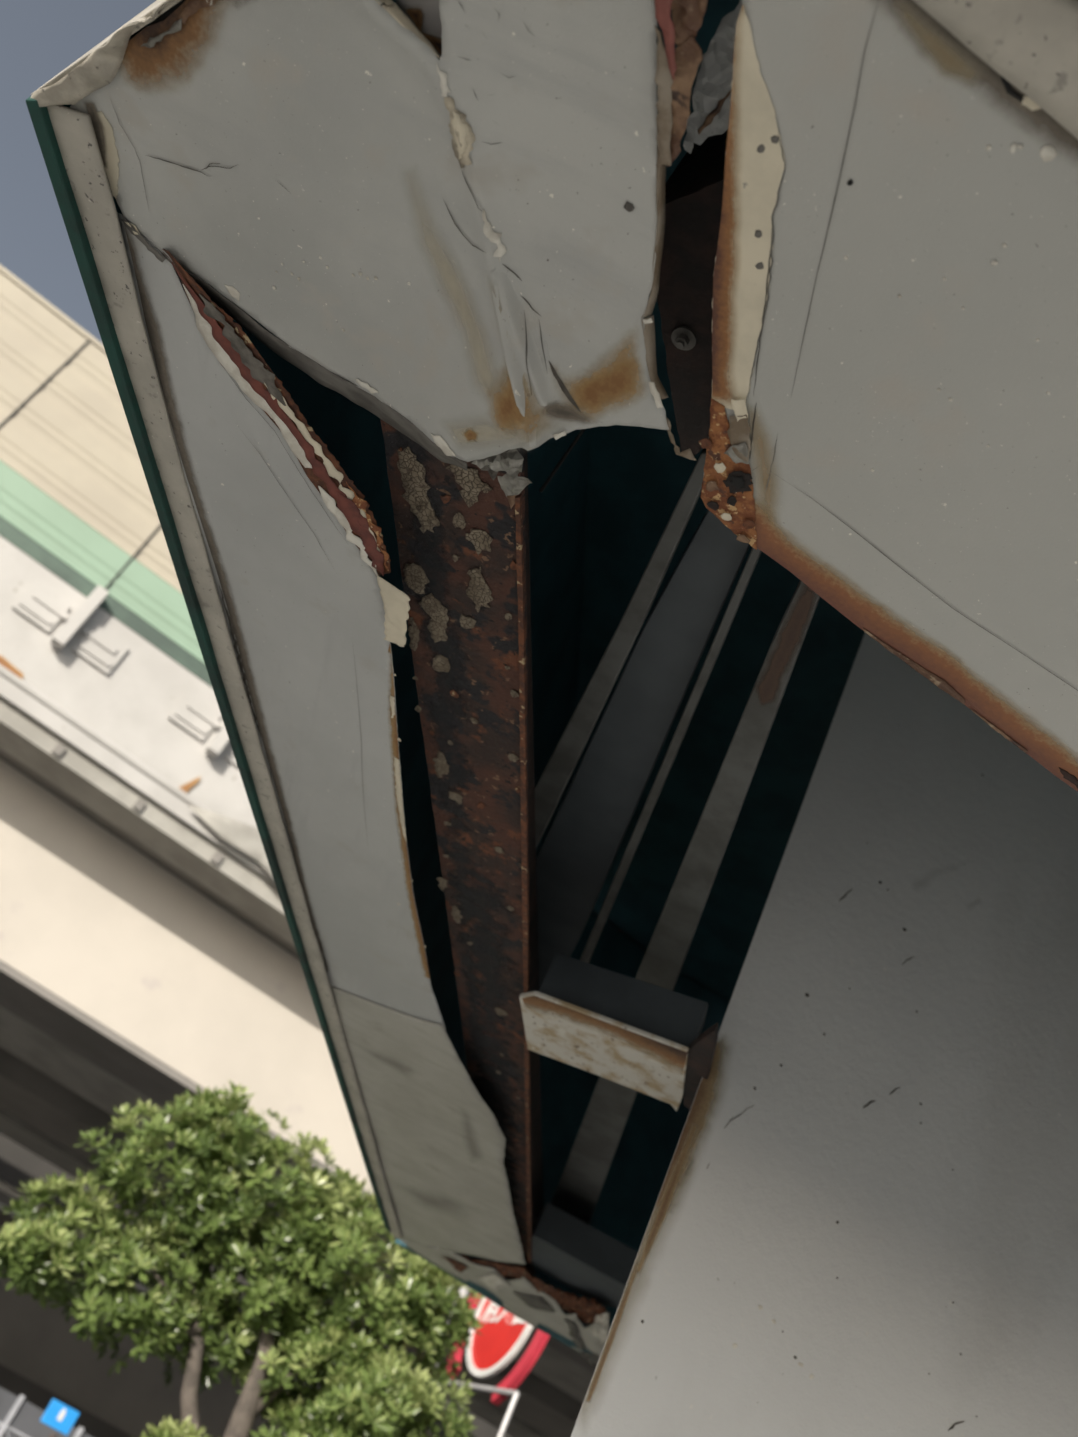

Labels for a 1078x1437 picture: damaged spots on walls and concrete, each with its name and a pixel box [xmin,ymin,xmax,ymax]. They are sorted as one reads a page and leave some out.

peeling [85,103,120,198]
corrosion [122,0,221,86]
crack [112,104,237,209]
corrosion [568,343,641,415]
peeling [648,382,664,408]
peeling [714,4,786,464]
crack [791,2,878,396]
corrosion [698,35,1078,792]
crack [749,215,1078,691]
corrosion [388,645,430,979]
corrosion [395,432,687,1231]
peeling [442,1256,586,1349]